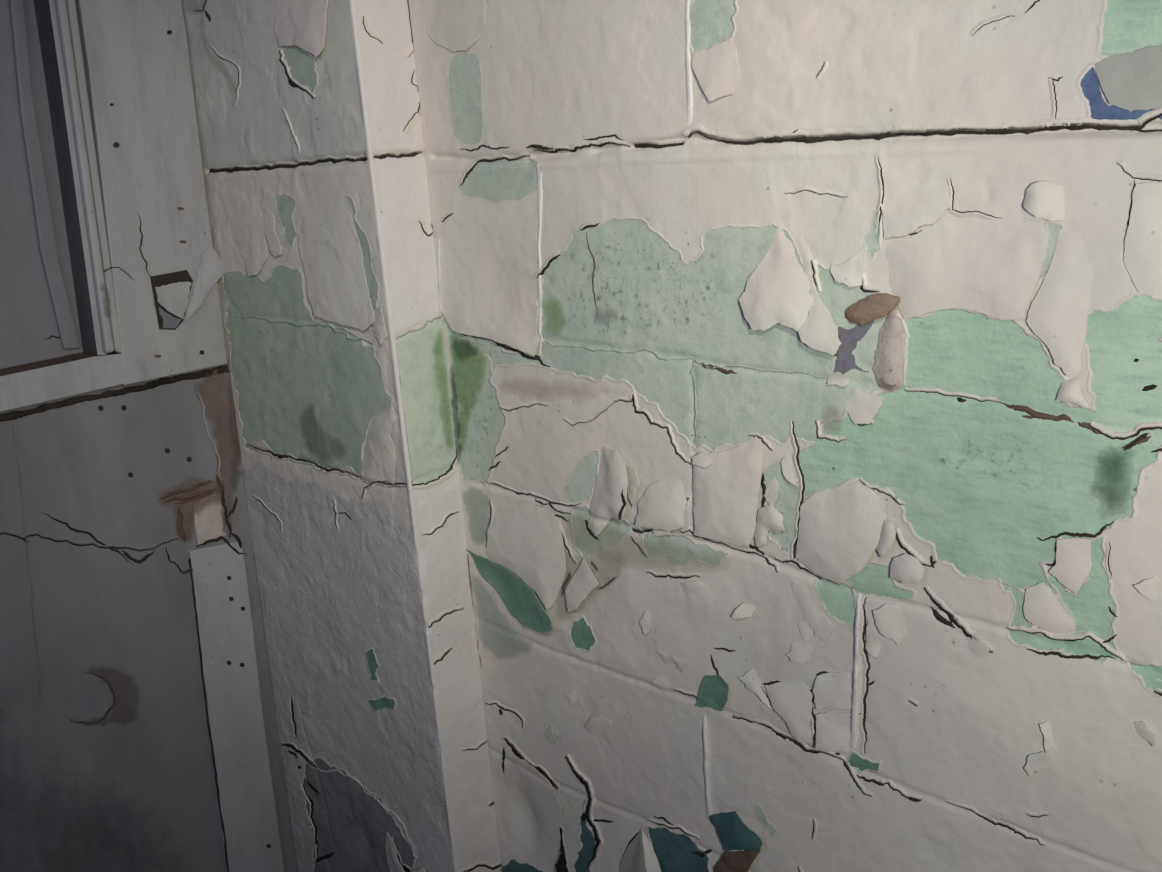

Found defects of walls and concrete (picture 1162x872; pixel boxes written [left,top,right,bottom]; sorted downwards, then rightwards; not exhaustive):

peeling [684,0,739,55]
peeling [1076,0,1162,134]
crack [418,77,1162,249]
crack [450,328,838,465]
peeling [184,156,1162,698]
crack [0,475,283,573]
crack [428,445,616,668]
crack [619,420,1049,846]
flaking render [298,756,425,872]
peeling [501,797,596,872]
crack [461,700,712,872]
peeling [619,801,779,872]